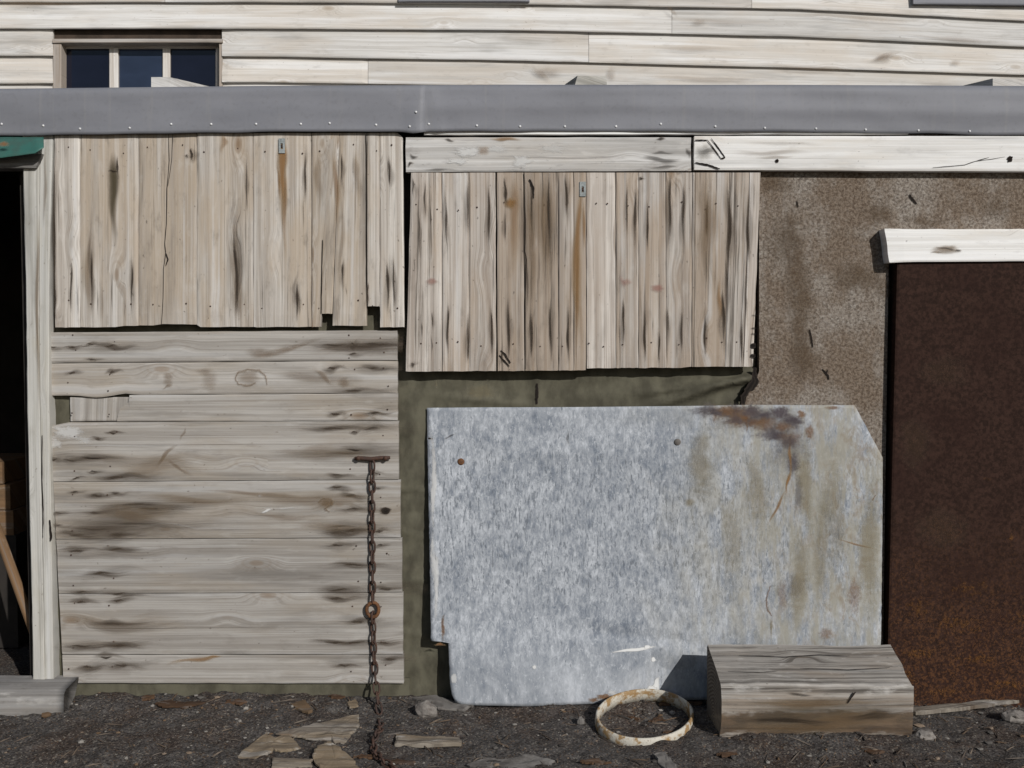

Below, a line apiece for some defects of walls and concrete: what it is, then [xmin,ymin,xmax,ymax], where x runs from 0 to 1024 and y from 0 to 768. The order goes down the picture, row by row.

crack [161,134,173,325]
rust [715,405,813,437]
rust [773,446,797,515]